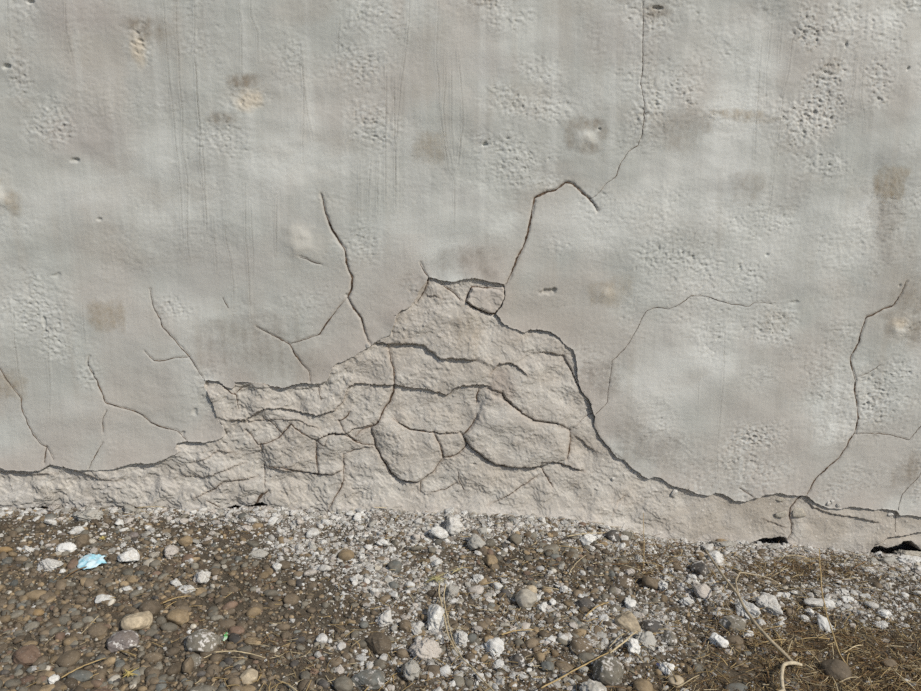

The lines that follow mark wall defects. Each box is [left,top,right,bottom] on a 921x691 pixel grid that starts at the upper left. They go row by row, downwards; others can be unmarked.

crack [418,57,645,314]
crack [0,369,52,462]
crack [88,359,182,466]
crack [145,290,202,376]
crack [263,197,368,401]
flaking render [0,277,921,553]
crack [198,295,765,508]
crack [786,282,921,541]